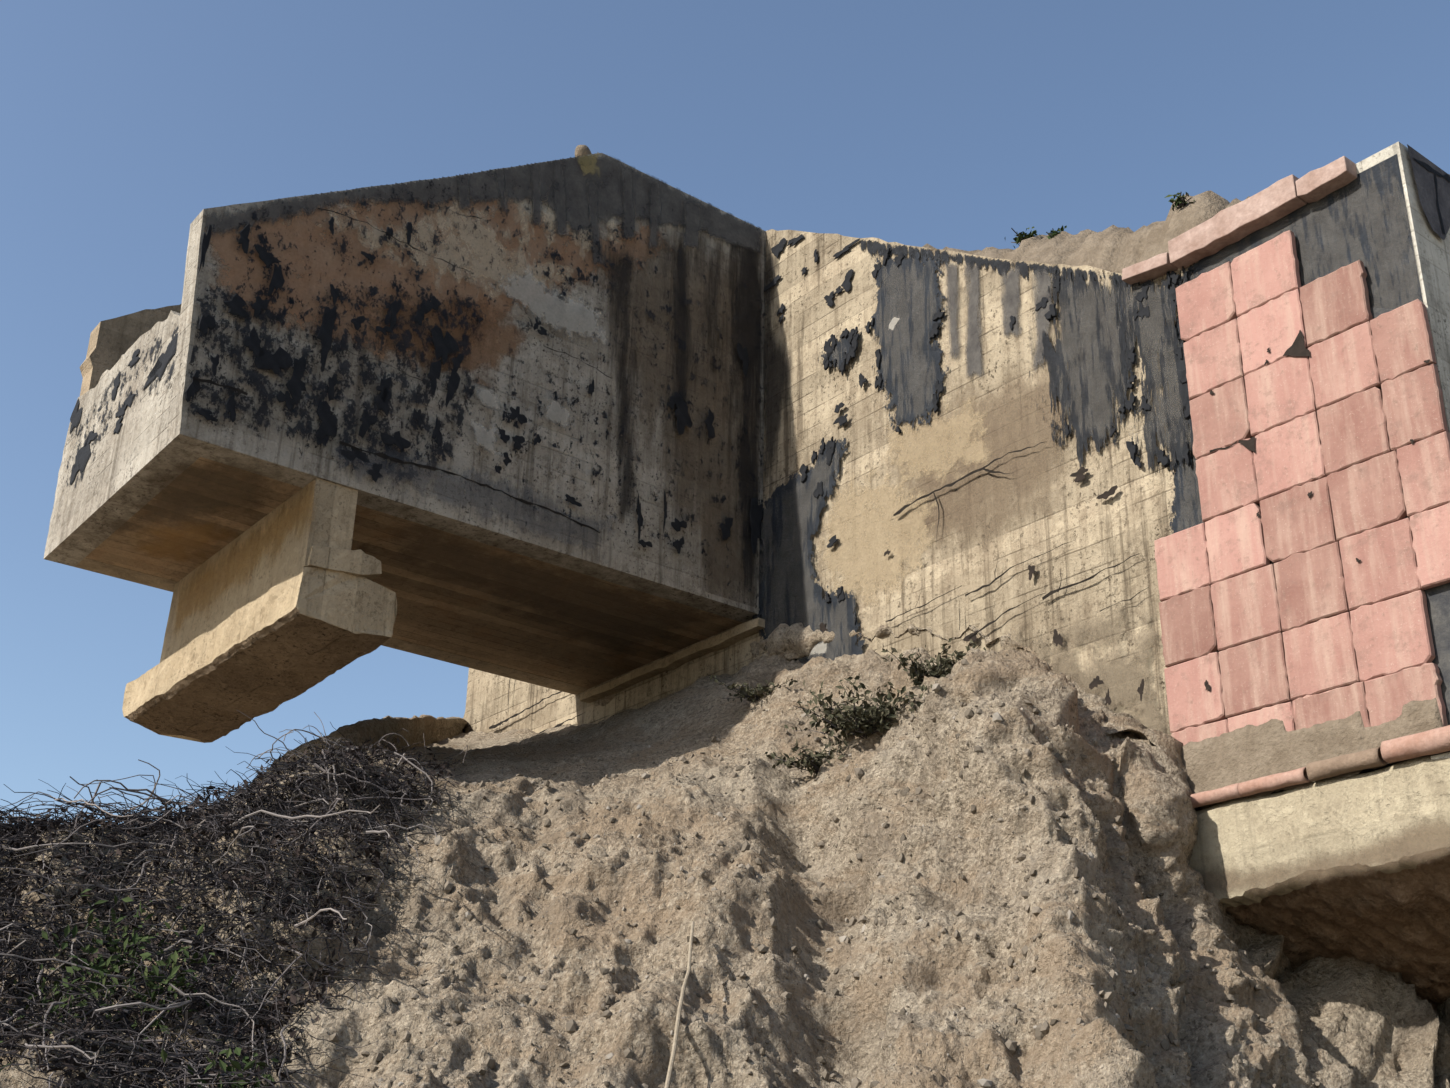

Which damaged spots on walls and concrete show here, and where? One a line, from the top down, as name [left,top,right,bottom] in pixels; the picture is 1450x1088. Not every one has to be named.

corrosion [209,197,673,383]
damp [205,155,1128,600]
crack [893,442,1045,530]
spalling [1202,825,1450,890]